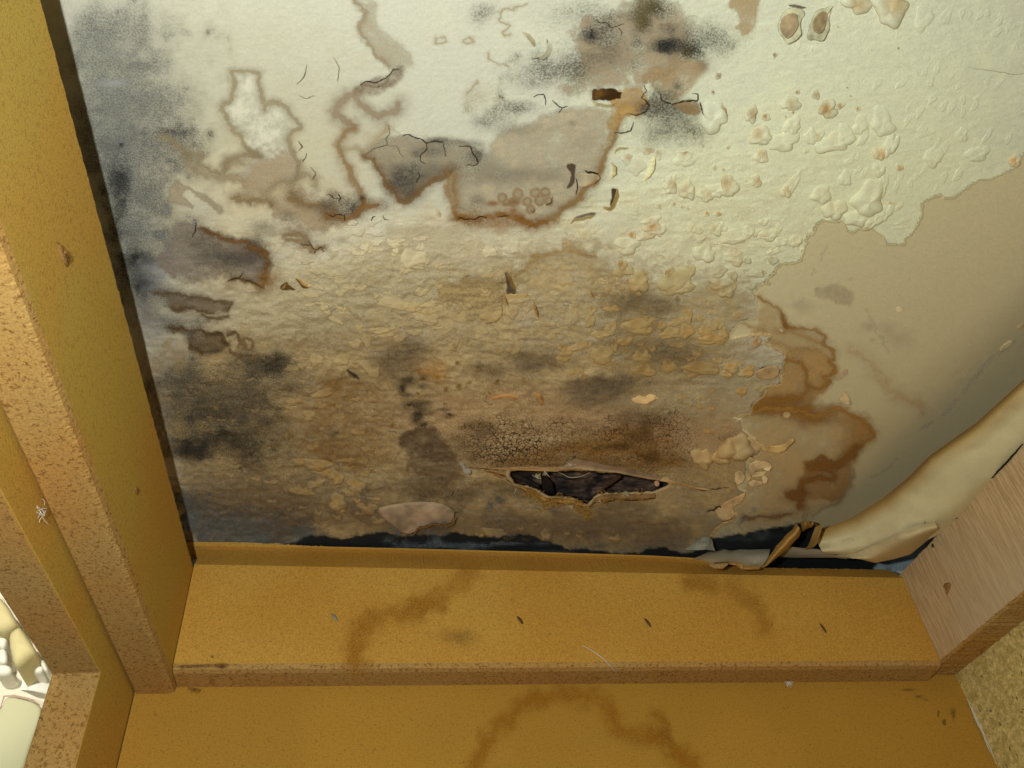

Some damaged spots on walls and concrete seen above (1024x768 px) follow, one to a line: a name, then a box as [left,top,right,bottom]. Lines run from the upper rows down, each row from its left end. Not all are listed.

crack [365,125,479,183]
peeling [567,147,630,224]
leakage [76,0,932,571]
peeling [707,154,1024,563]
crack [463,401,536,483]
peeling [378,502,456,535]